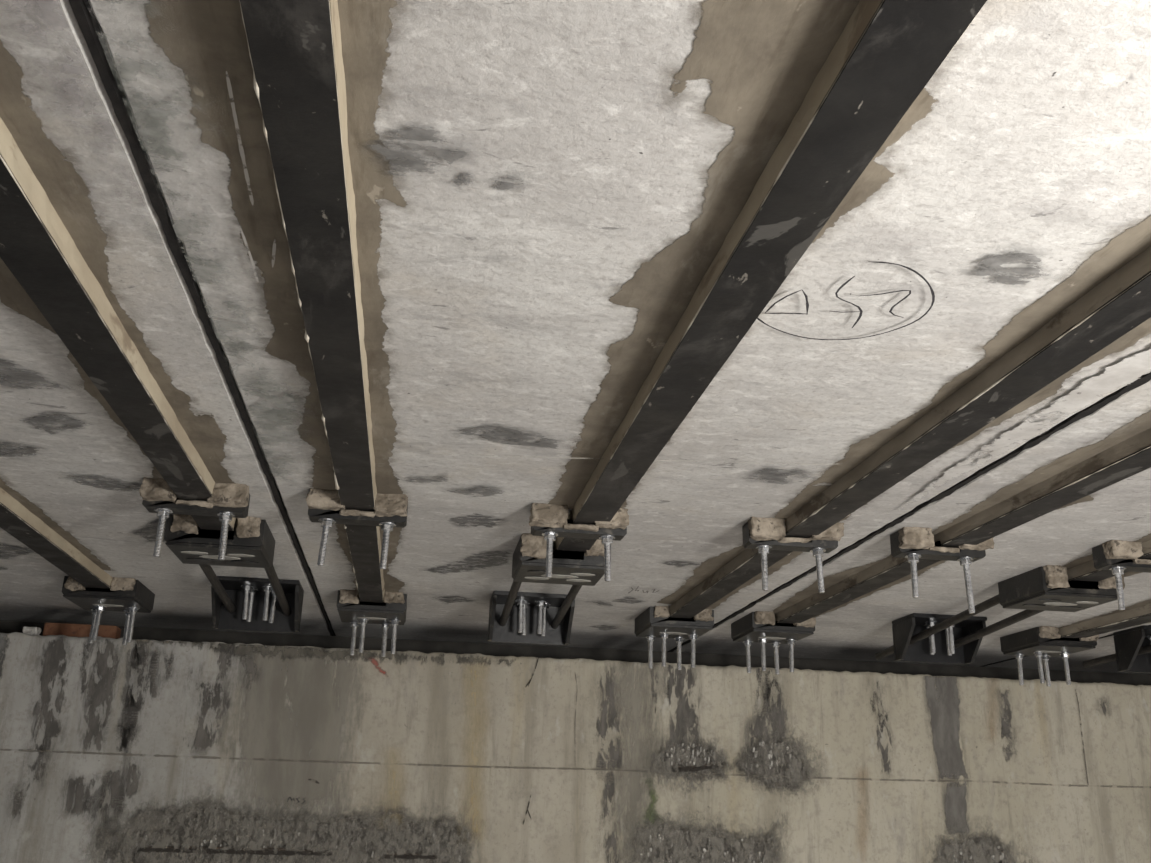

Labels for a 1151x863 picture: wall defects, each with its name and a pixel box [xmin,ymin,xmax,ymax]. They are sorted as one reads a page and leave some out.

leakage [0,634,9,677]
leakage [12,638,67,817]
leakage [80,639,513,813]
spalling [651,734,815,791]
leakage [924,676,969,835]
leakage [63,764,139,853]
spalling [91,799,472,863]
spalling [631,818,781,863]
spalling [934,833,1016,863]